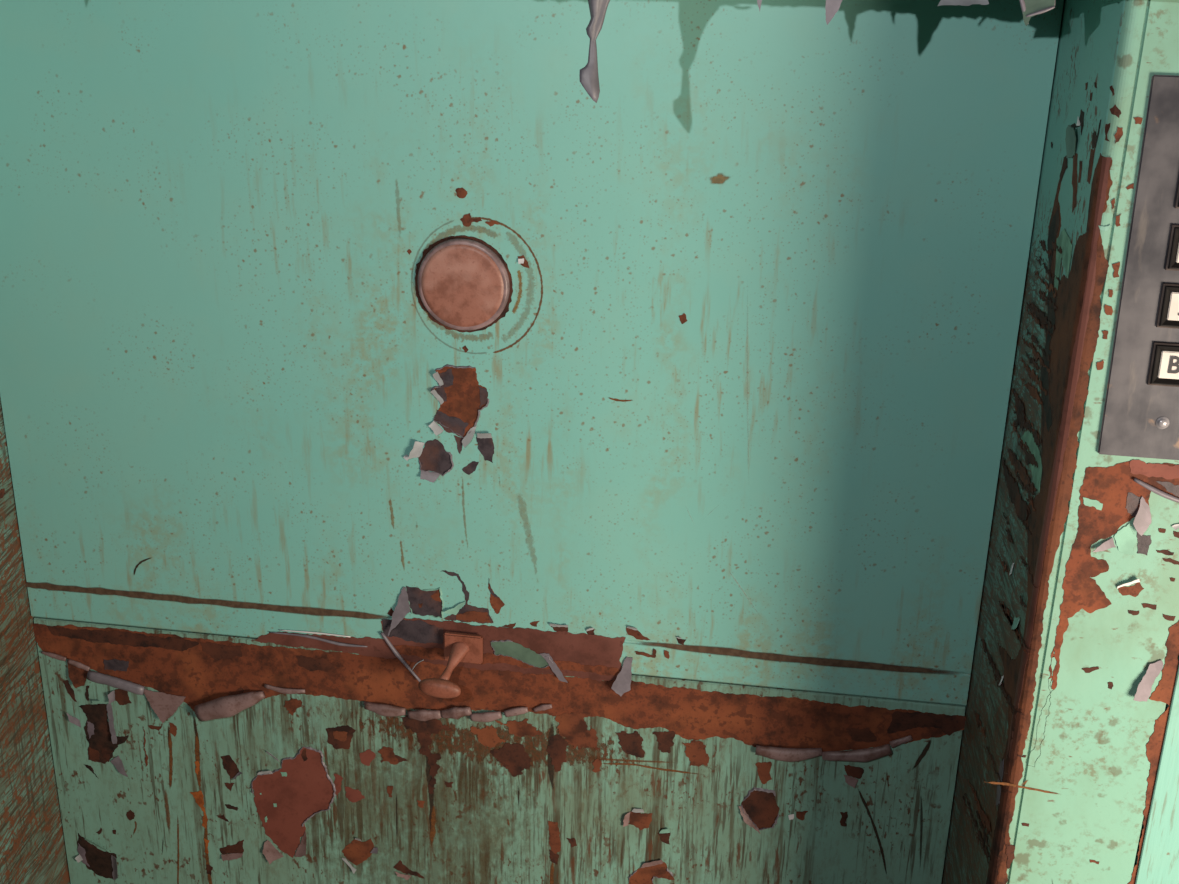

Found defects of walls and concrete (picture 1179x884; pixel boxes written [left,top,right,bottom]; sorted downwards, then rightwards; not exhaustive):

peeling [579,0,610,103]
rust [1104,262,1120,316]
peeling [403,364,494,482]
peeling [963,105,1179,884]
rust [25,582,385,619]
rust [284,698,314,715]
peeling [33,570,966,833]
rust [643,643,953,674]
peeling [217,725,376,865]
rust [336,712,709,844]
rust [988,780,1058,794]
peeling [75,828,118,880]